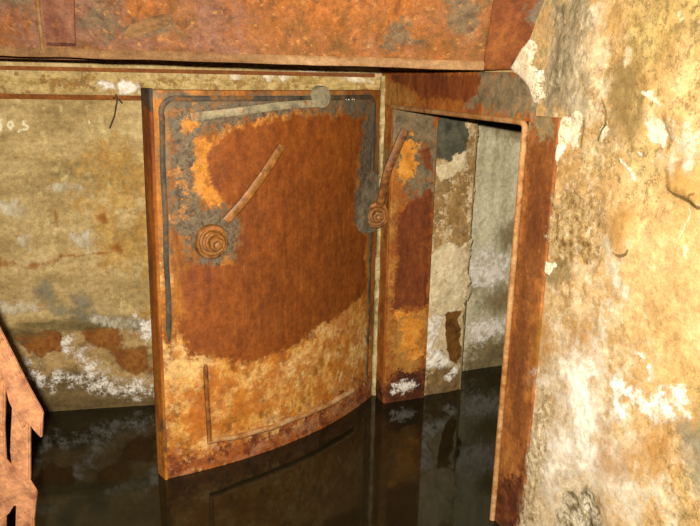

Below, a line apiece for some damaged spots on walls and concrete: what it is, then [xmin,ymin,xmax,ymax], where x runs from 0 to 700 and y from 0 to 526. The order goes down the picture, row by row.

peeling [436,151,467,182]
crack [667,187,700,249]
peeling [429,238,473,317]
efflorescence [603,238,629,298]
efflorescence [0,302,36,314]
leakage [11,297,154,400]
corrosion [435,311,461,363]
efflorescence [391,379,417,395]
efflorescence [536,304,691,516]